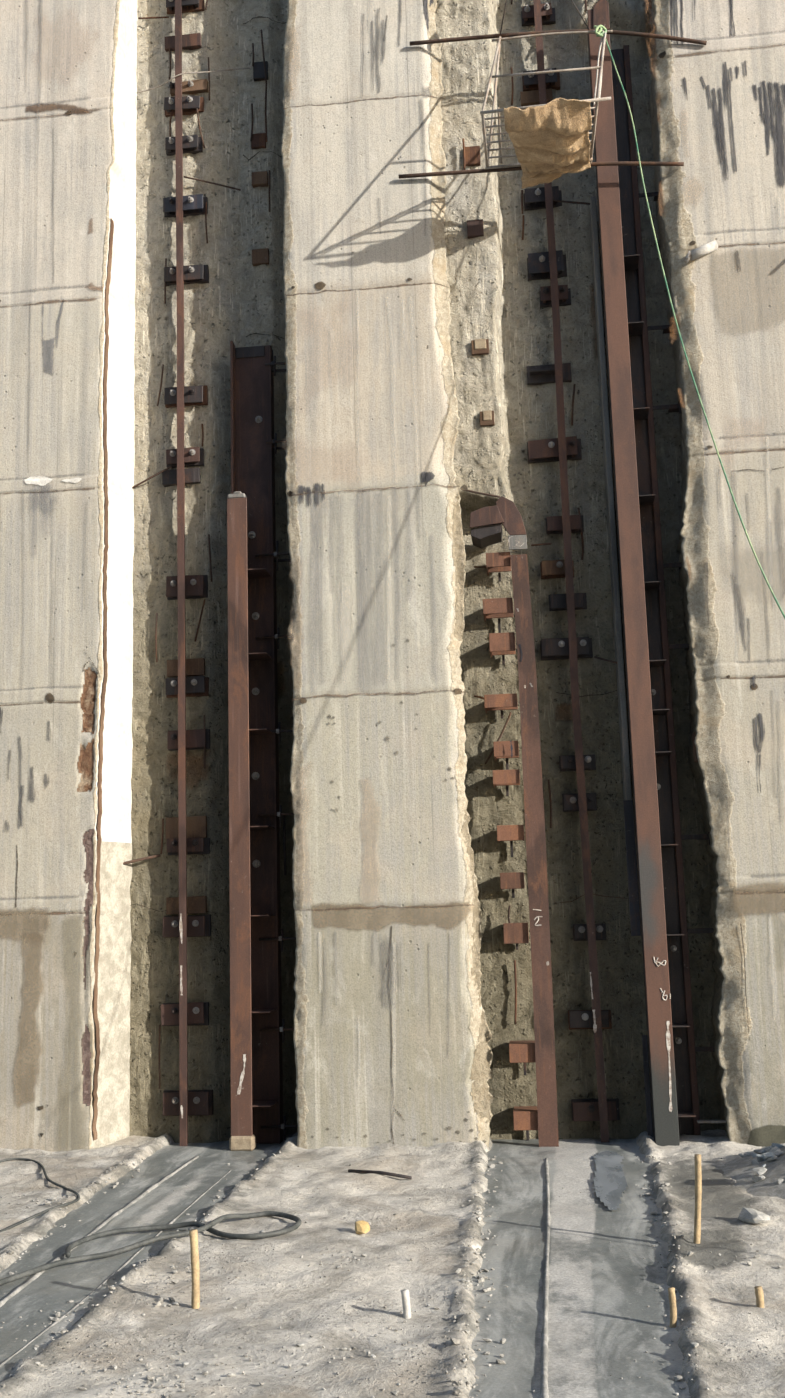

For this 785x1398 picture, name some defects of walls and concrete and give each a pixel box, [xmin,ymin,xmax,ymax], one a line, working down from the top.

leakage [362,0,402,93]
leakage [669,0,696,45]
leakage [683,60,785,188]
spalling [452,490,500,641]
leakage [732,575,756,687]
leakage [754,713,765,792]
leakage [0,908,48,1106]
spalling [461,809,493,1123]